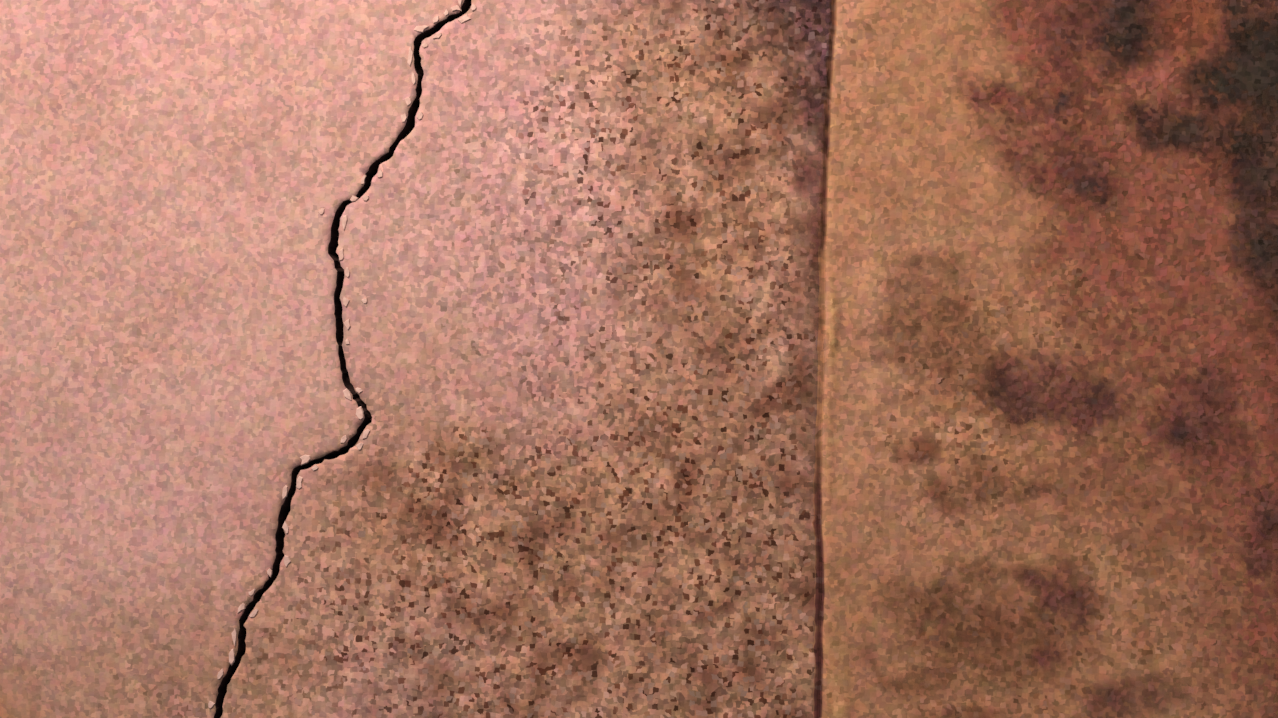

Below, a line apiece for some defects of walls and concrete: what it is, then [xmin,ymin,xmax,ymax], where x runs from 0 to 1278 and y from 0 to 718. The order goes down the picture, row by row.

water stain [1069,0,1167,66]
water stain [736,0,830,263]
water stain [967,86,1110,204]
water stain [1130,0,1278,325]
crack [208,0,477,718]
water stain [886,304,1123,432]
water stain [1158,369,1235,452]